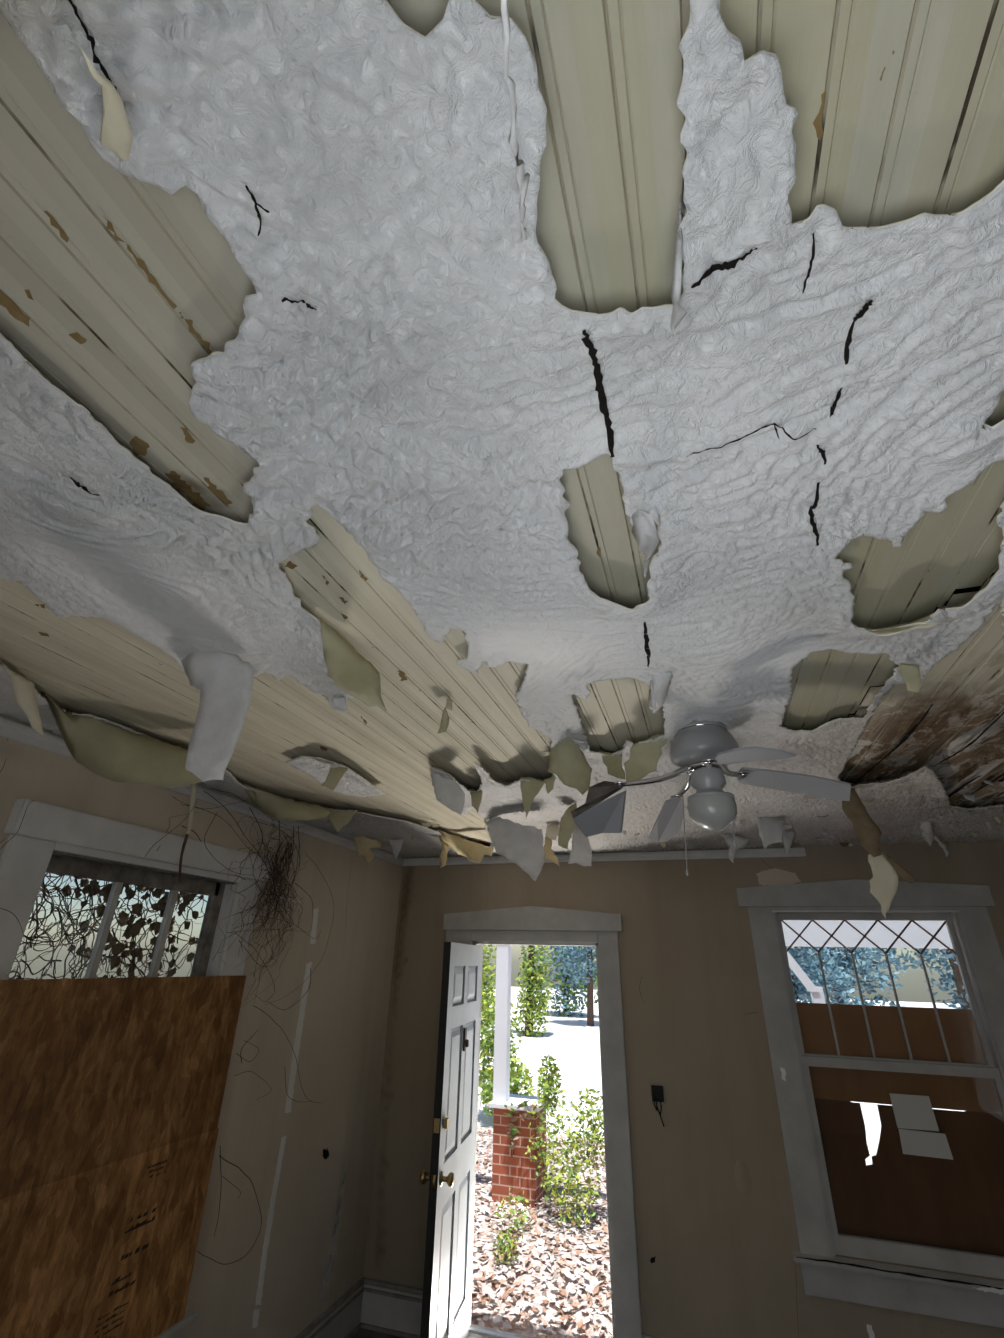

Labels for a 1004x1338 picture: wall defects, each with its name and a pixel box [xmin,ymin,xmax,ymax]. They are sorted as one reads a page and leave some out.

crack [68,0,117,90]
peeling [387,0,449,36]
peeling [476,0,1004,337]
peeling [0,12,260,523]
crack [581,329,615,458]
crack [687,300,873,546]
peeling [982,391,1004,430]
peeling [559,454,661,609]
peeling [836,460,1004,636]
peeling [0,504,673,881]
peeling [780,602,1004,918]
peeling [721,817,801,886]